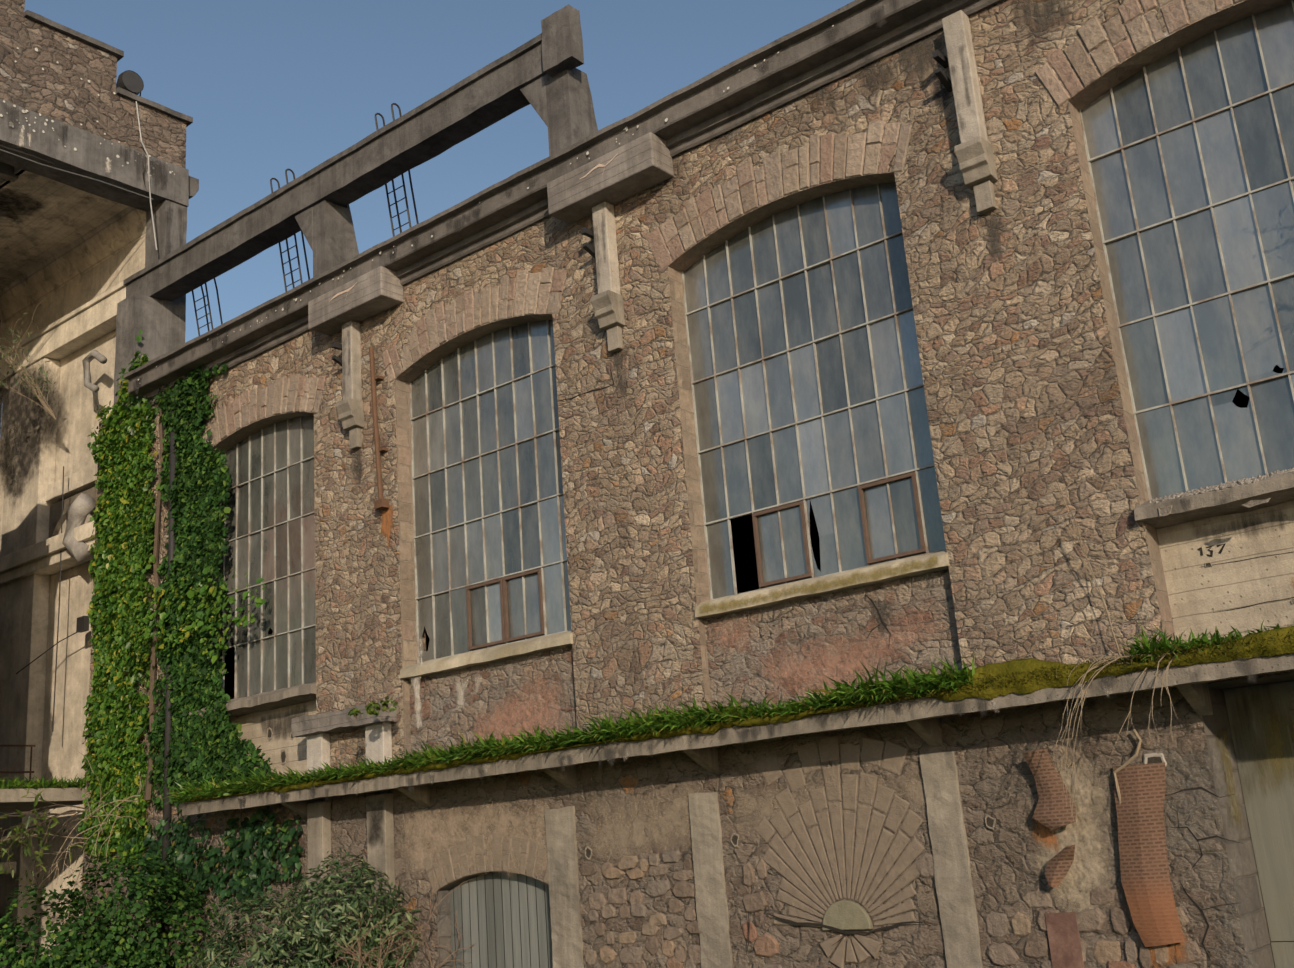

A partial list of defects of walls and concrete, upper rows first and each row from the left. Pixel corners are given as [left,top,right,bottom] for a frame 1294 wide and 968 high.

corrosion [1023,748,1076,888]
corrosion [1113,762,1186,967]